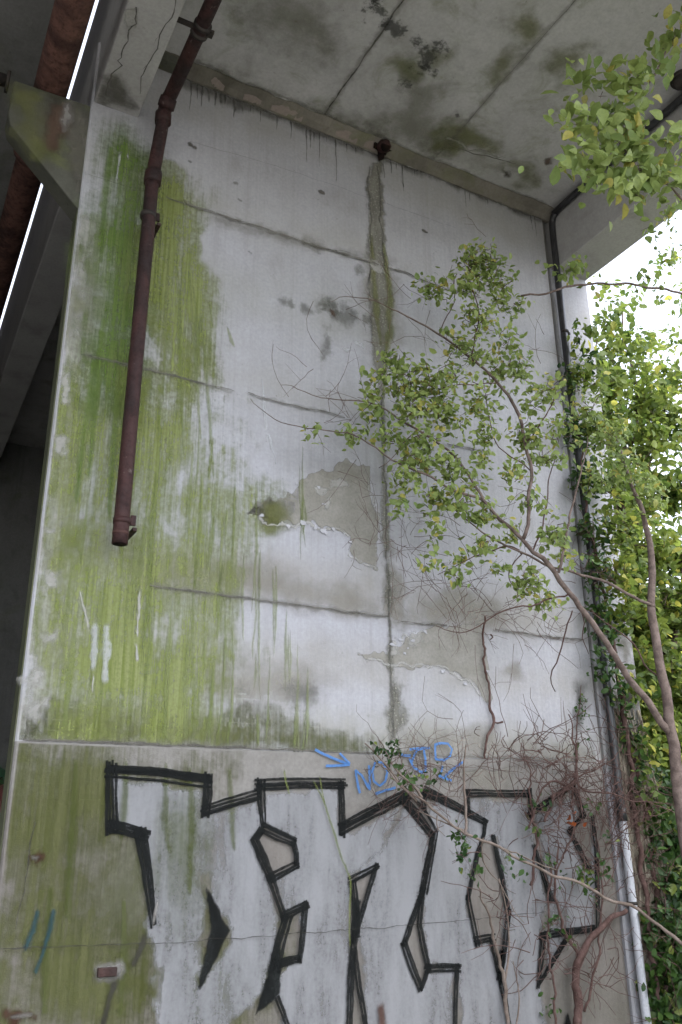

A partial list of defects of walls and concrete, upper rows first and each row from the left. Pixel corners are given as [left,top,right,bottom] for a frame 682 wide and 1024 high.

crack [105,0,176,95]
water stain [362,0,497,157]
water stain [184,79,360,180]
water stain [366,153,421,741]
peeling [248,458,381,571]
water stain [23,698,146,742]
water stain [161,674,369,752]
peeling [358,624,493,703]